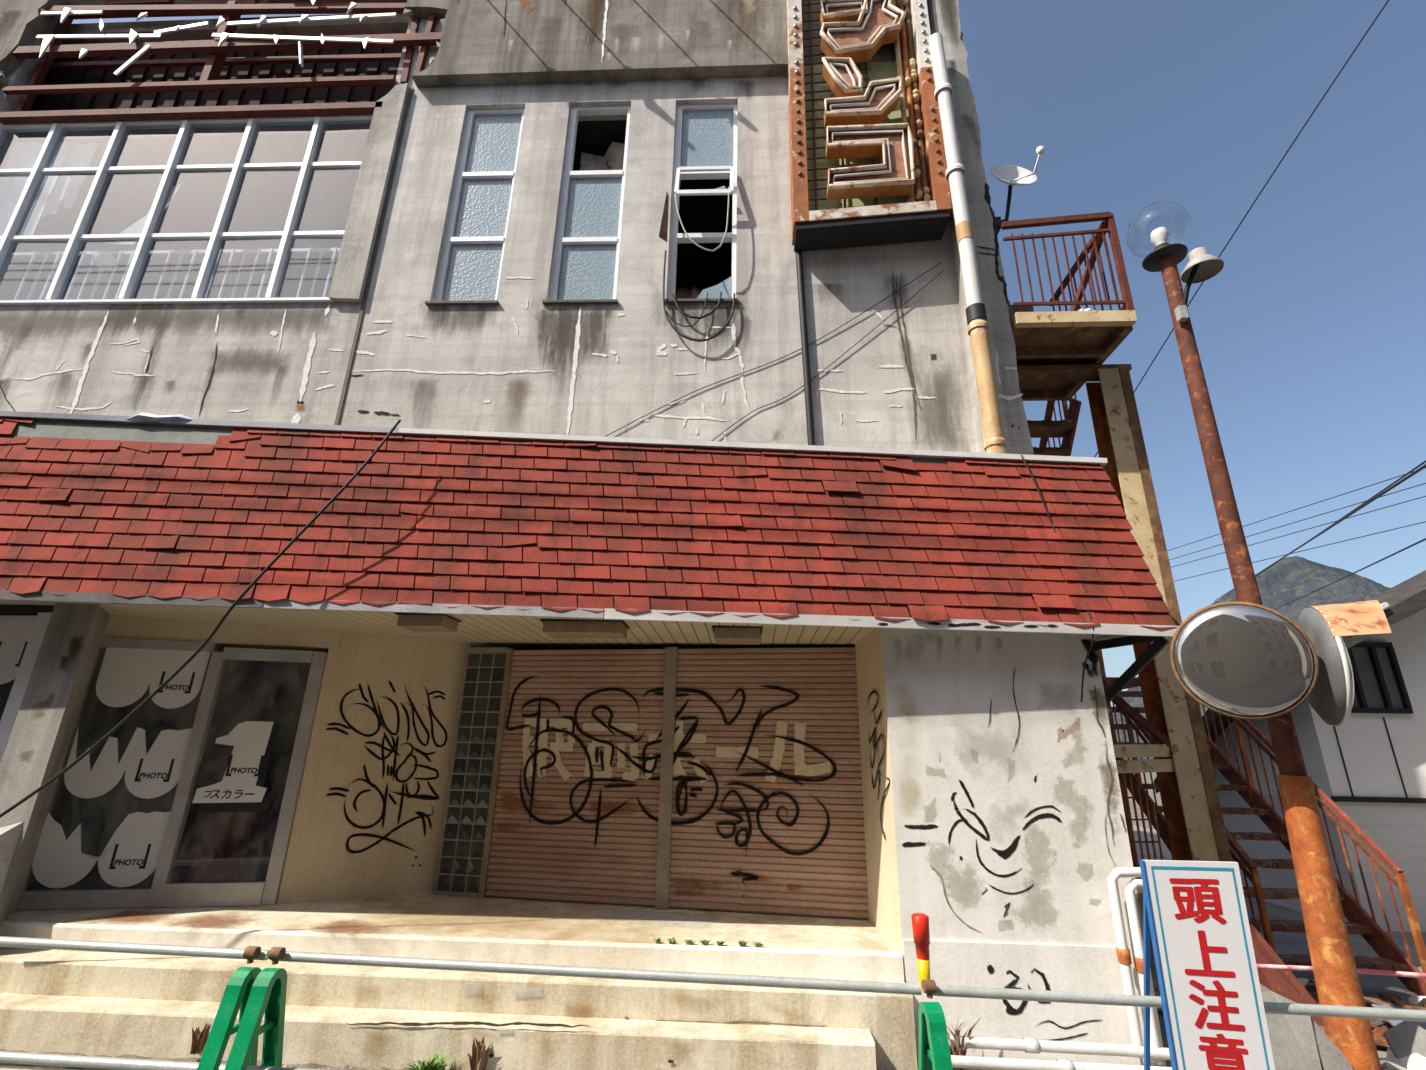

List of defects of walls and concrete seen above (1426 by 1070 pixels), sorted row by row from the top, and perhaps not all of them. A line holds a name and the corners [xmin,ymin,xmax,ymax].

leakage [0,309,321,346]
leakage [542,310,609,350]
leakage [210,355,280,376]
corrosion [1119,368,1182,626]
leakage [1081,639,1106,717]
leakage [1100,764,1117,808]
corrosion [1185,691,1232,862]